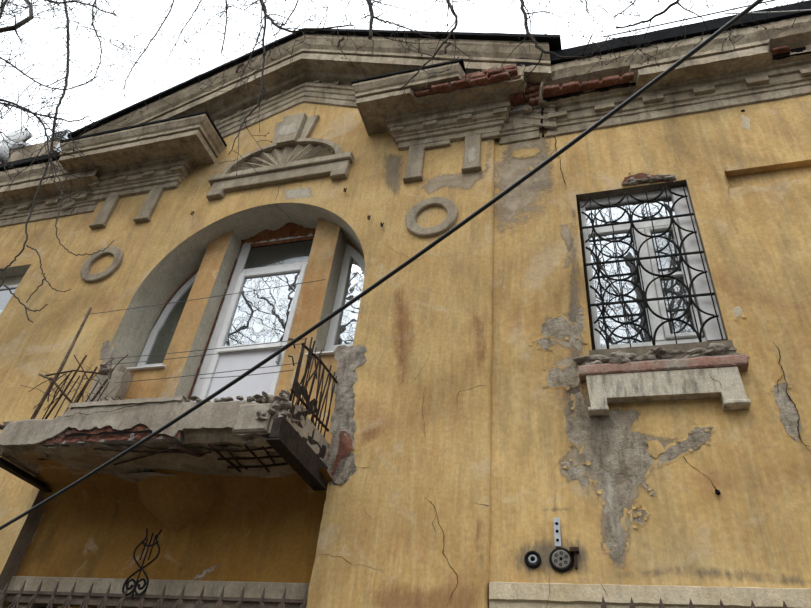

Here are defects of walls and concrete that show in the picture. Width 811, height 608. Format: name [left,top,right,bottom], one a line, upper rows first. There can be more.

peeling [422,137,553,232]
crack [540,108,566,185]
spalling [186,259,307,424]
spalling [38,424,296,483]
spalling [325,344,367,486]
spalling [529,305,717,567]
crack [773,342,810,451]
crack [426,499,458,608]